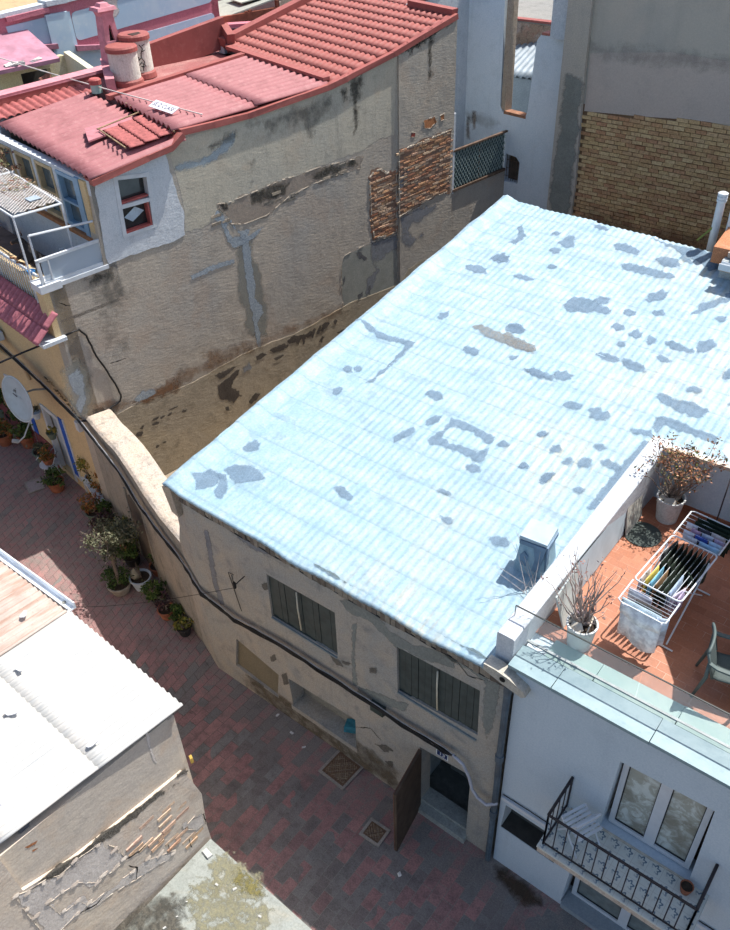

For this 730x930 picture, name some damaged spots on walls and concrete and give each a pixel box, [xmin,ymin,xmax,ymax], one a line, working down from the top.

flaking render [211,113,453,240]
peeling [12,842,176,930]
water stain [116,893,184,930]